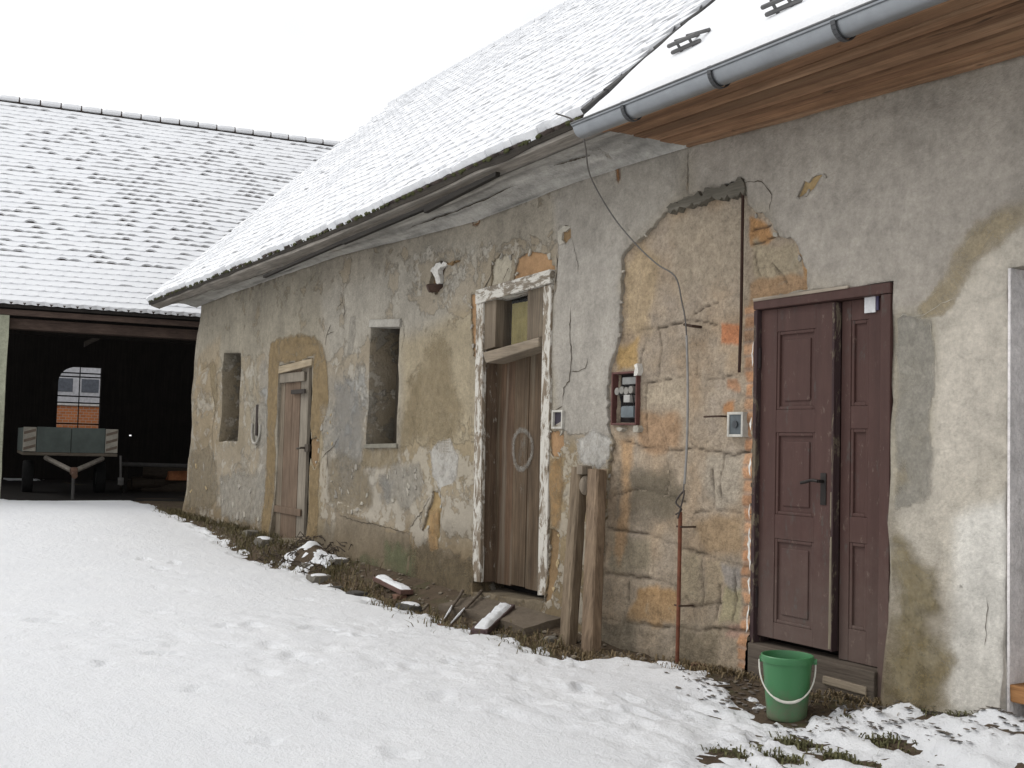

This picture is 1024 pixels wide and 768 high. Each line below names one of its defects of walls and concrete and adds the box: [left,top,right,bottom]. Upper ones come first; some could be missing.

spalling [796,174,827,199]
spalling [492,226,571,286]
crack [556,319,588,410]
spalling [601,177,808,674]